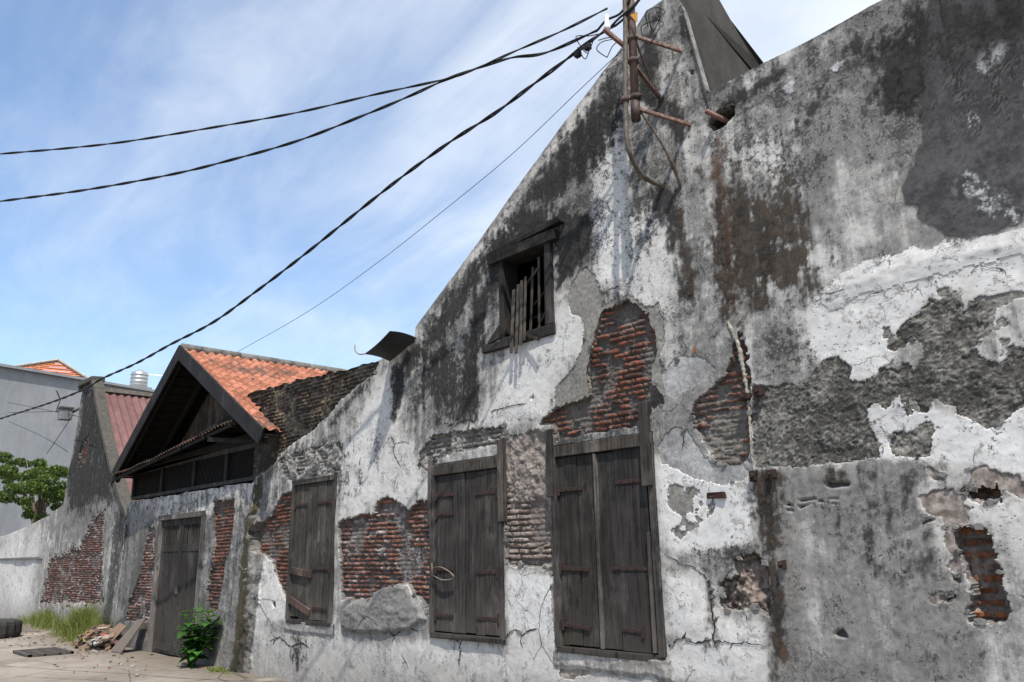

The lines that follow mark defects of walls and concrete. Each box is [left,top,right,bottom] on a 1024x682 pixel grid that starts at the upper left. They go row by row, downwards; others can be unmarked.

leakage [834,0,1024,241]
leakage [390,73,623,428]
flaking render [42,513,105,606]
leakage [66,388,157,625]
flaking render [209,500,235,614]
flaking render [248,361,379,593]
flaking render [340,497,430,614]
crack [668,556,766,649]
peeling [418,266,1024,634]